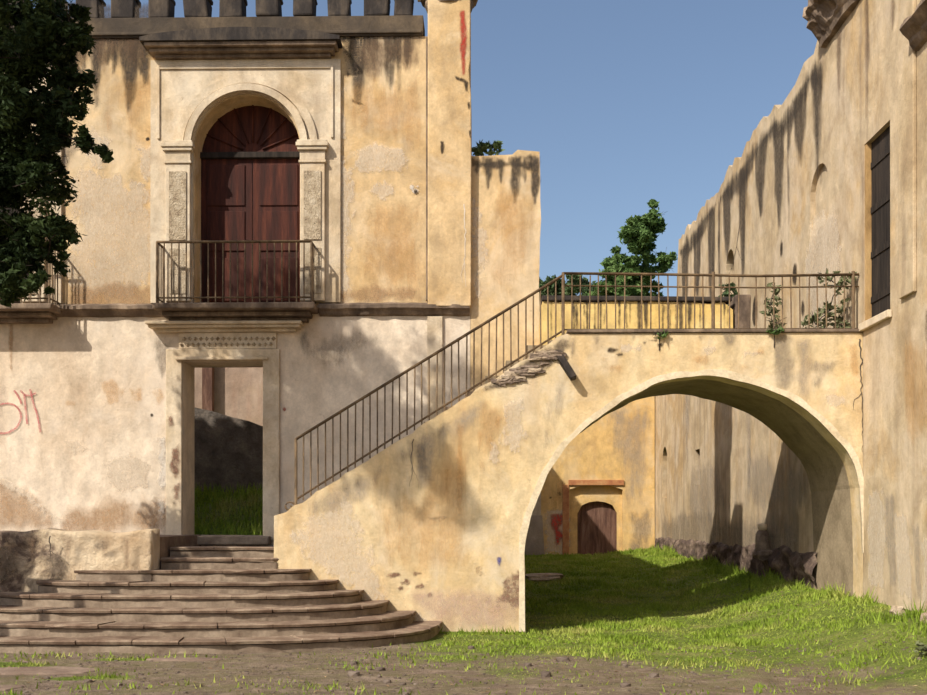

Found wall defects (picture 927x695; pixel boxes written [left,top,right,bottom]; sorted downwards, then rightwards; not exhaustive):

water stain [72,38,149,109]
water stain [476,156,539,202]
water stain [675,65,822,328]
water stain [573,301,602,329]
water stain [637,301,658,329]
spalling [485,340,567,390]
crack [853,339,863,447]
spalling [170,448,179,498]
water stain [63,503,166,549]
spalling [500,575,519,607]